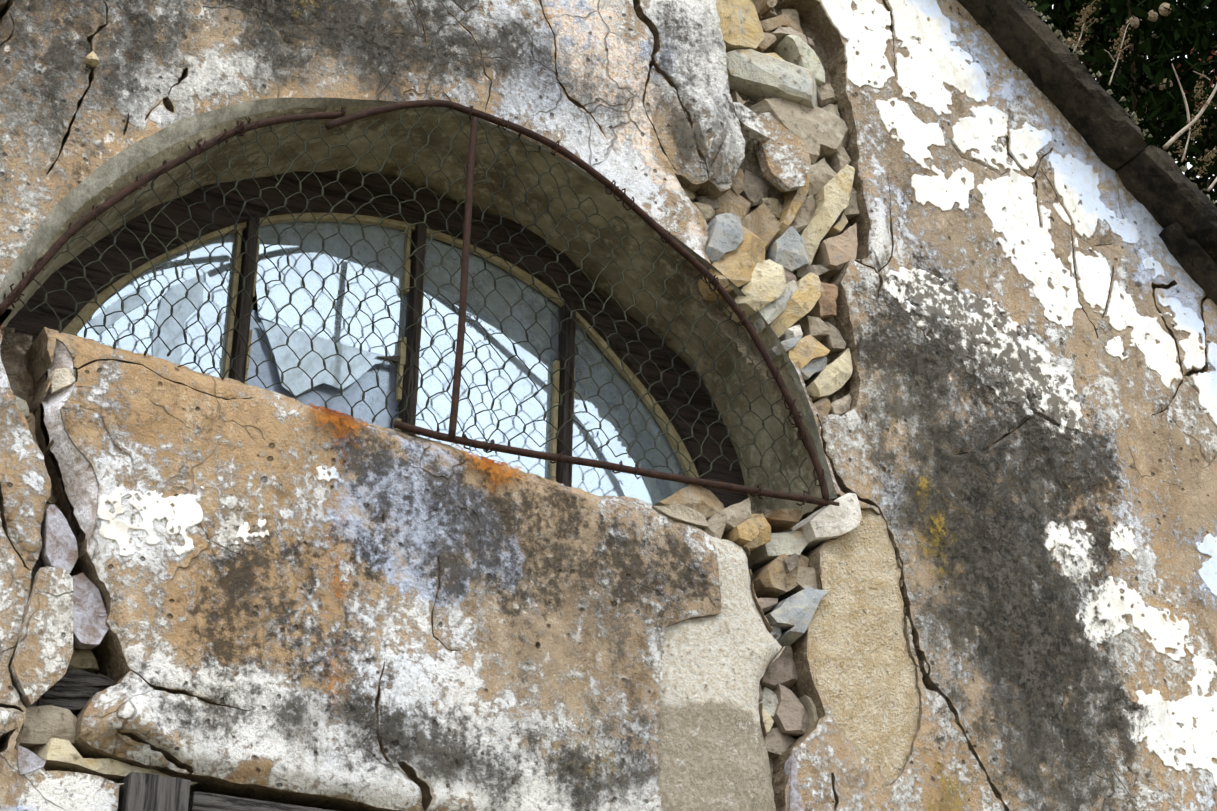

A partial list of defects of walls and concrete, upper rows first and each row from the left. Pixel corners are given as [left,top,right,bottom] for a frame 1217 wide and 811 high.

leakage [0,0,199,136]
crack [633,0,711,193]
spalling [675,0,1217,438]
spalling [0,327,205,787]
rust [310,403,368,478]
rust [327,500,351,613]
leakage [273,686,522,811]
rust [452,443,529,493]
crack [810,414,1009,811]
leakage [843,275,1163,811]
peeling [1040,520,1217,786]
crack [1151,280,1208,415]